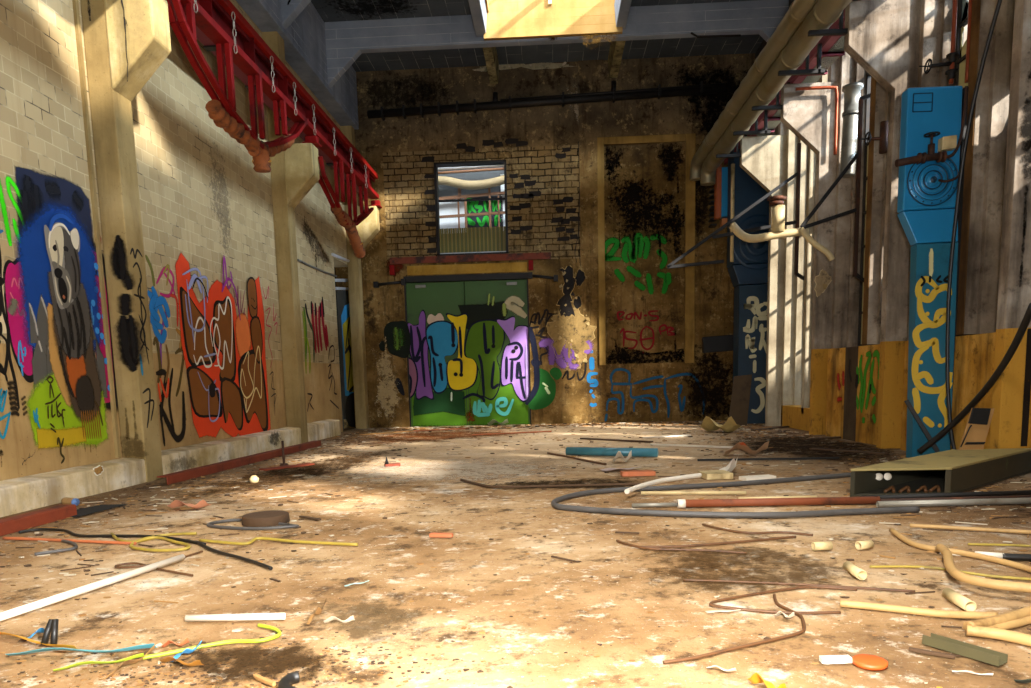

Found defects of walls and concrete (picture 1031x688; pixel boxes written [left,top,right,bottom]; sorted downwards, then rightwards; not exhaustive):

water stain [604,142,713,258]